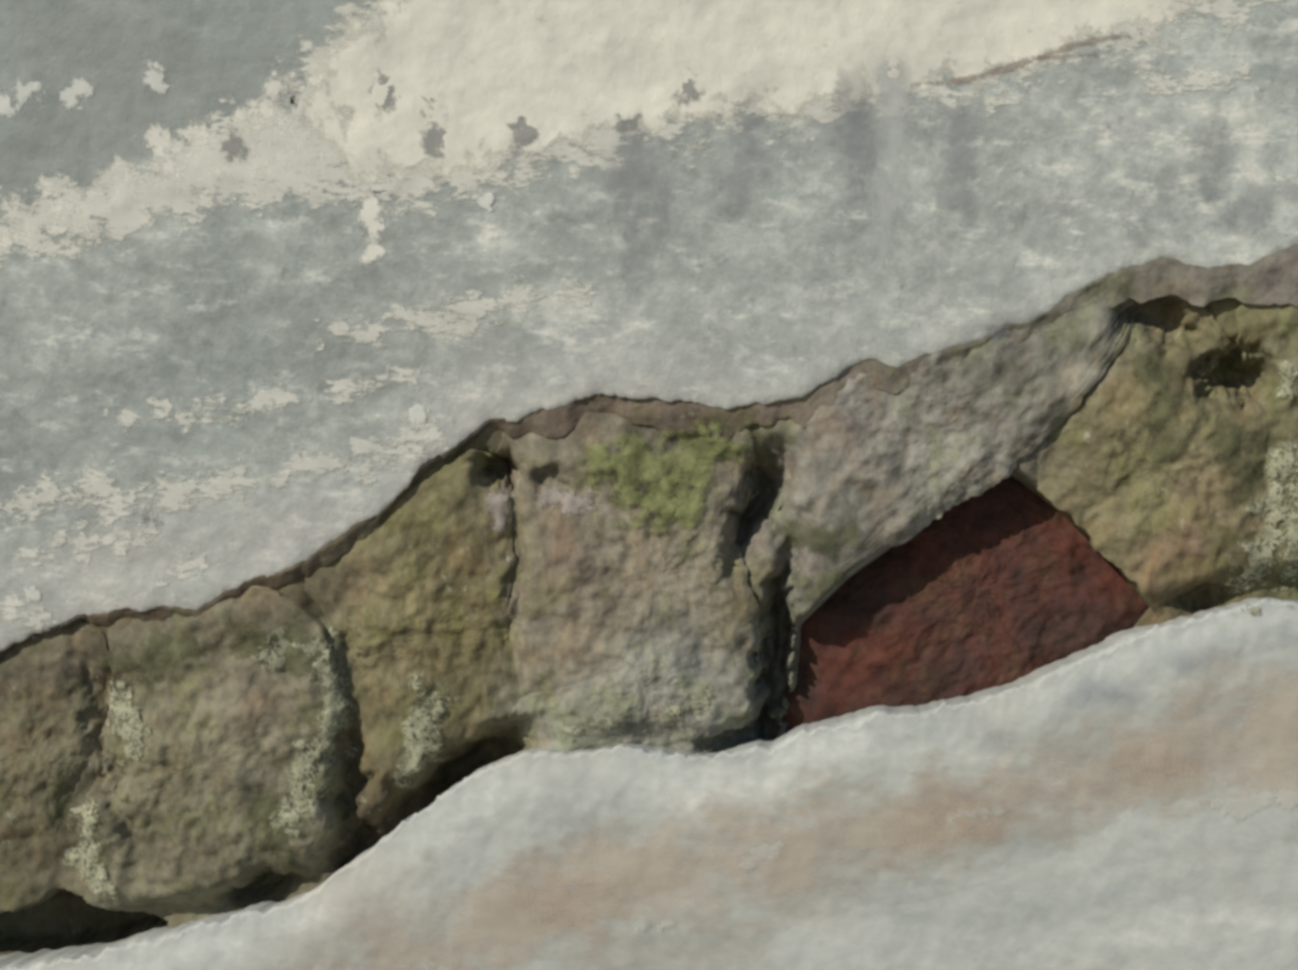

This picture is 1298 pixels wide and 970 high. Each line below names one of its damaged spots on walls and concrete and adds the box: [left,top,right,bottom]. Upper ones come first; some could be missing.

peeling [0,0,1282,268]
spalling [0,244,1298,955]